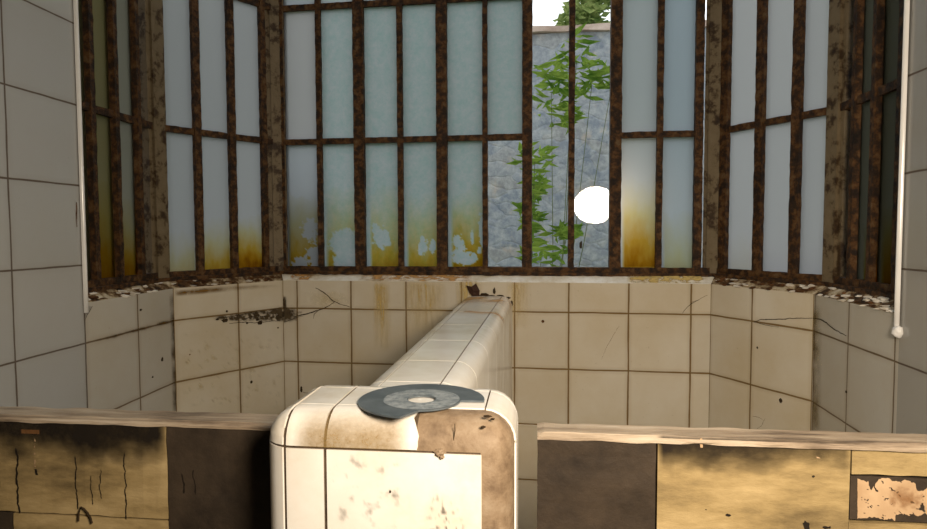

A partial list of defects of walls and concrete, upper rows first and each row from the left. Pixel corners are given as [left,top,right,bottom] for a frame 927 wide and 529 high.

spalling [116,275,275,298]
crack [295,288,349,319]
spalling [715,277,894,313]
leakage [0,421,162,518]
peeling [857,478,927,521]